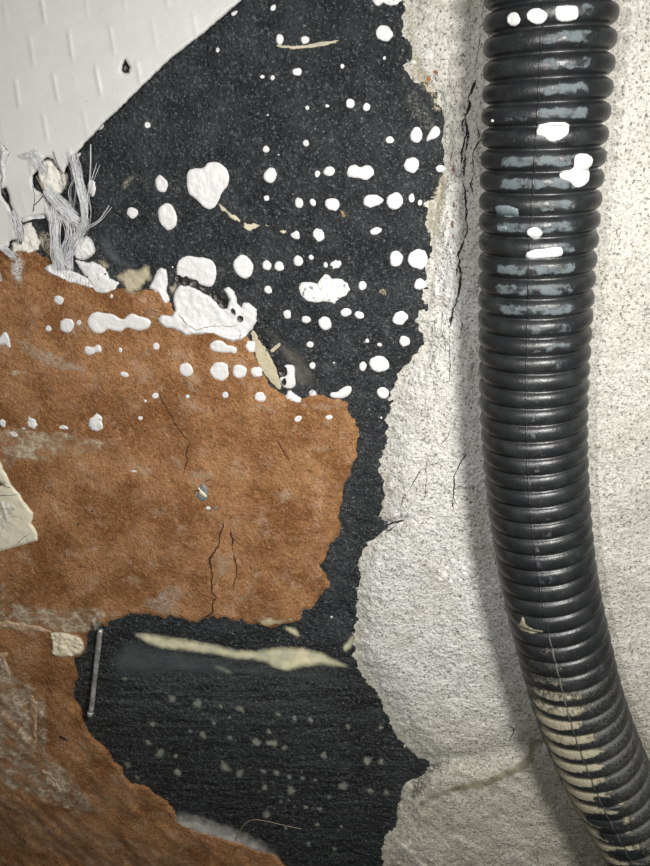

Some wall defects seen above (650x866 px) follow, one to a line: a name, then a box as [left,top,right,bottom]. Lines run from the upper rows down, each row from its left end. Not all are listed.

crack [448,7,484,384]
peeling [45,260,119,293]
peeling [149,268,287,386]
crack [159,394,190,471]
crack [194,479,238,619]
peeling [0,620,51,633]